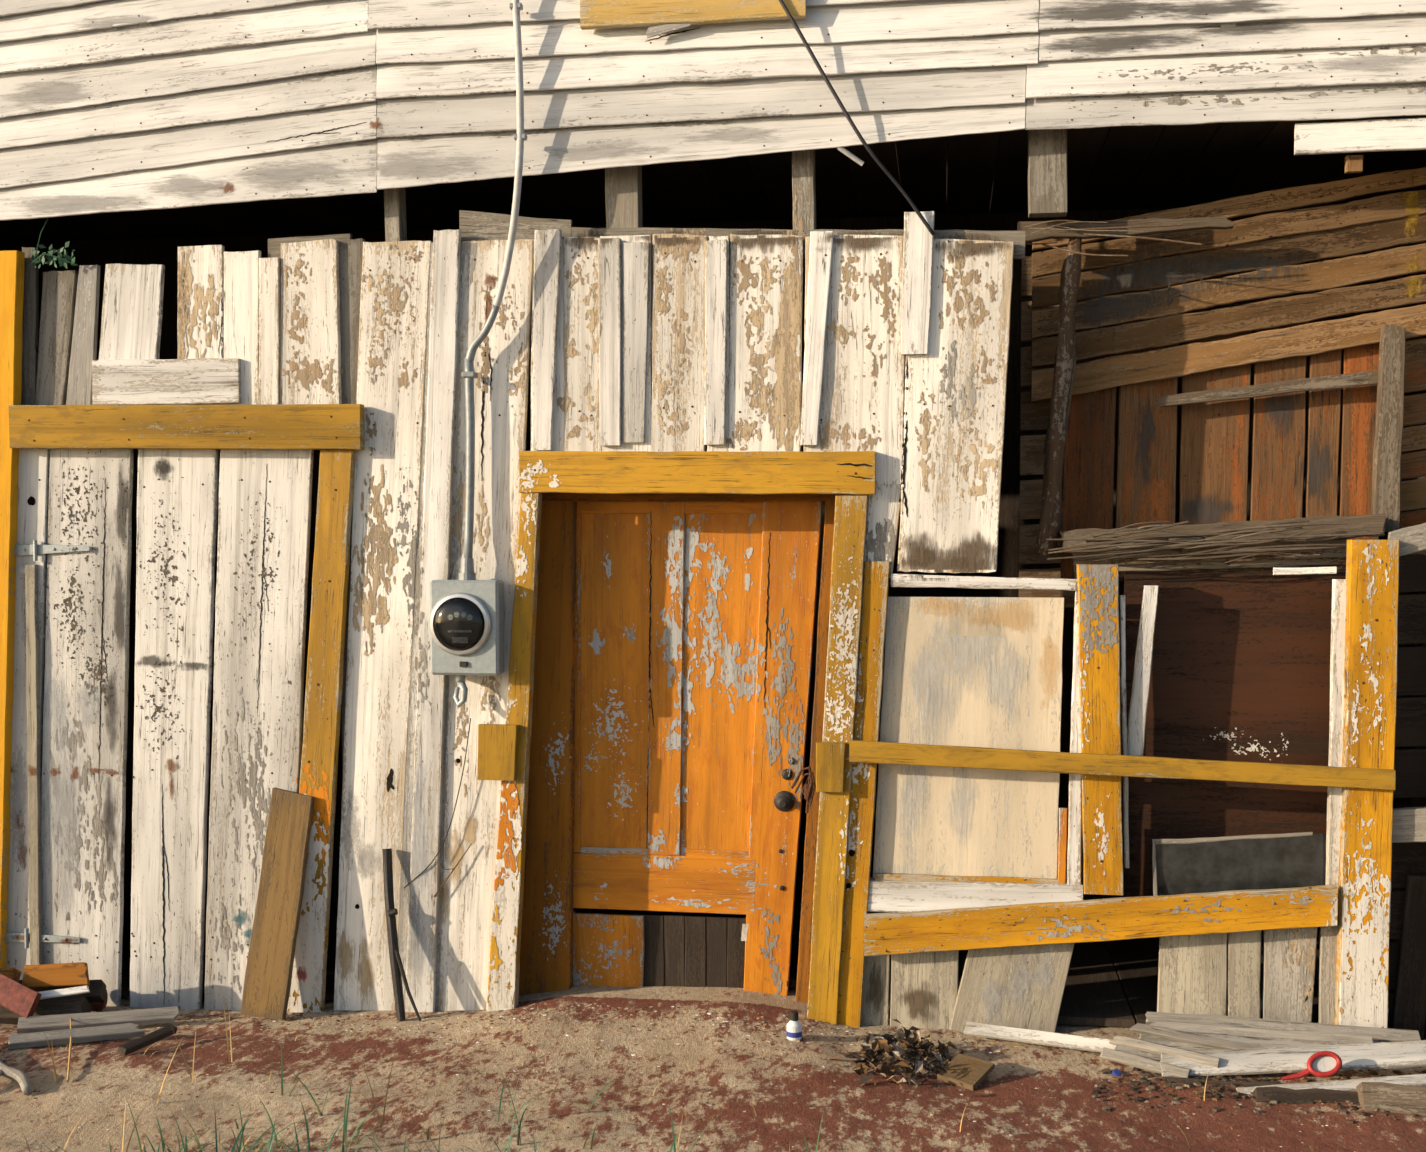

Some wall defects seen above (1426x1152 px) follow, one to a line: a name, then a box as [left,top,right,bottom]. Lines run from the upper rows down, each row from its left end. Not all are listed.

leakage [1036,0,1294,54]
peeling [361,244,423,392]
peeling [723,195,881,452]
peeling [827,246,898,386]
peeling [915,238,1004,508]
peeling [38,449,118,941]
peeling [350,408,431,716]
peeling [656,513,806,808]
peeling [824,518,896,890]
leakage [902,532,996,581]
peeling [1068,565,1124,749]
peeling [1346,540,1392,767]